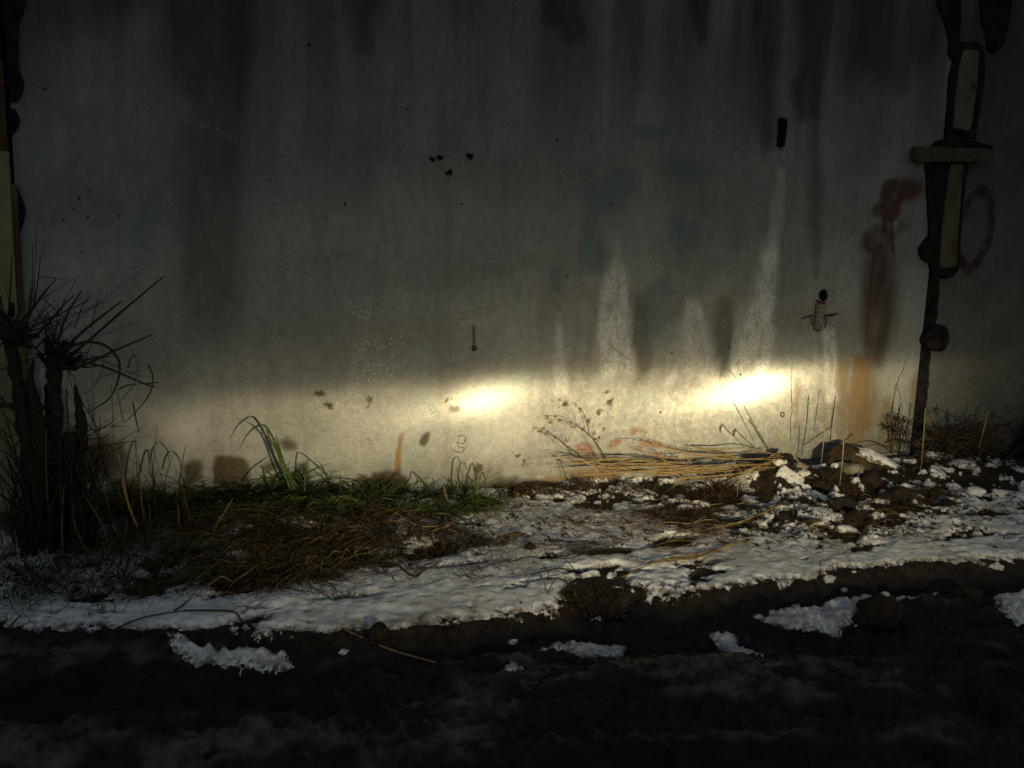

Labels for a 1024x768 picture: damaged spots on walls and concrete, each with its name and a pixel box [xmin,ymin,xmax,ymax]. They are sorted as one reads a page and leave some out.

water stain [554,326,568,395]
water stain [597,244,648,381]
water stain [665,173,784,385]
rust [839,251,892,445]